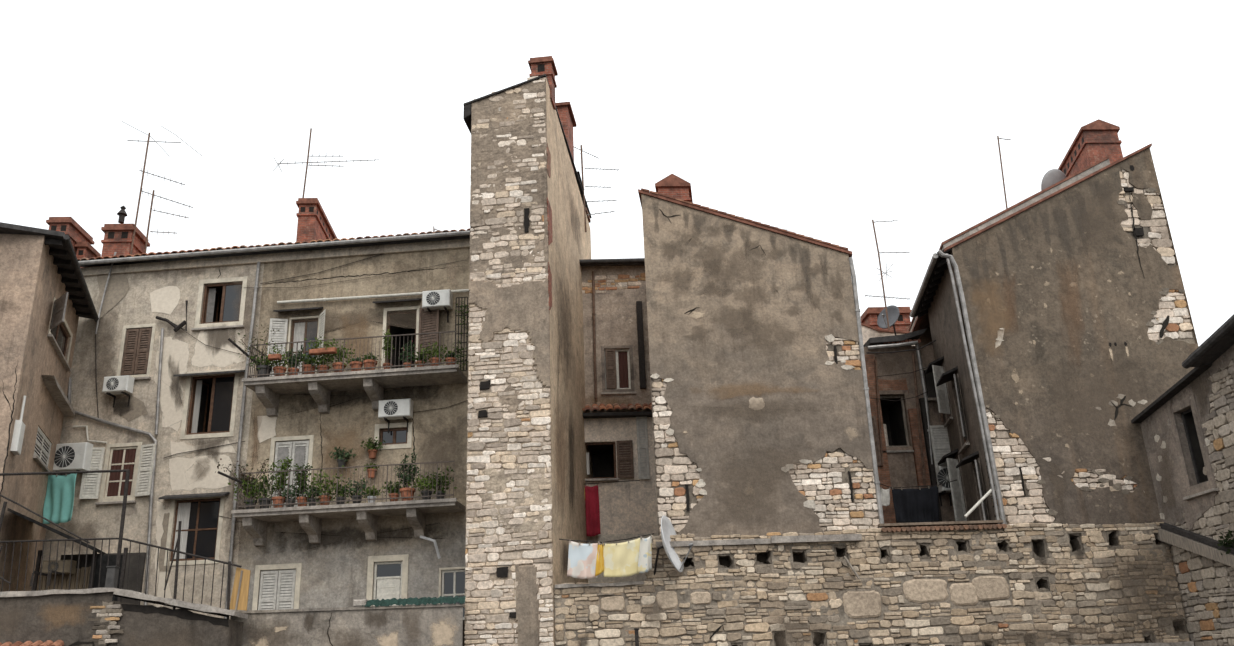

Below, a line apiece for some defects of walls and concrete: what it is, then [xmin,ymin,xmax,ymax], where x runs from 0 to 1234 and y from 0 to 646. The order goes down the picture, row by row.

flaking render [1117,165,1177,268]
flaking render [111,329,246,491]
flaking render [464,76,554,646]
flaking render [650,373,707,536]
flaking render [781,448,880,533]
flaking render [825,334,861,370]
flaking render [982,408,1145,528]
spalling [1096,394,1147,426]
flaking render [1136,286,1196,345]
flaking render [1160,356,1234,544]
flaking render [87,501,229,646]
flaking render [1169,544,1234,646]